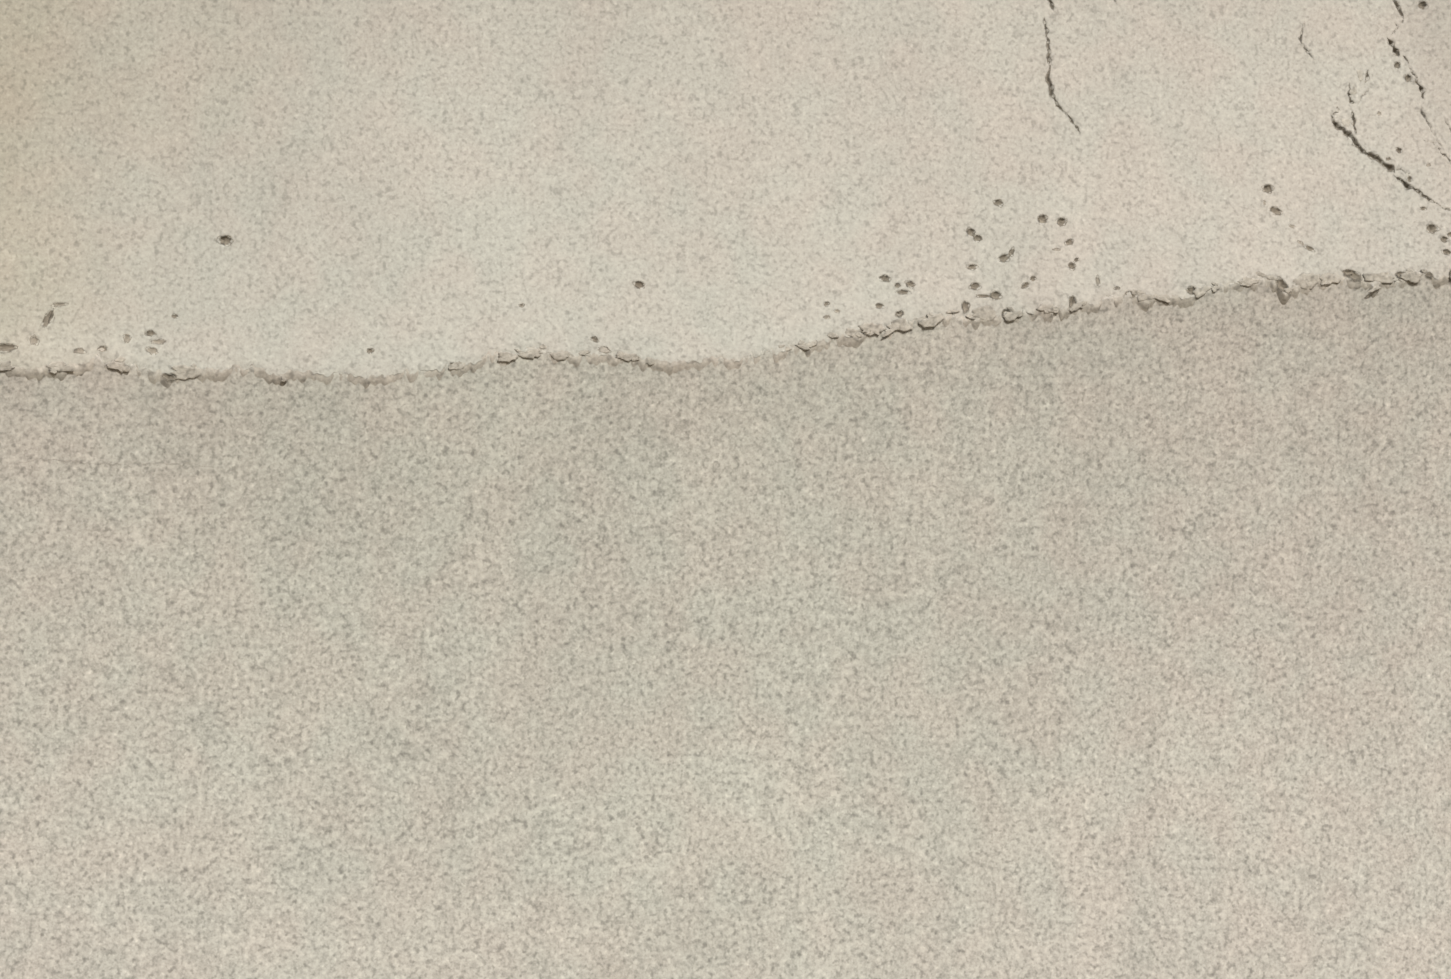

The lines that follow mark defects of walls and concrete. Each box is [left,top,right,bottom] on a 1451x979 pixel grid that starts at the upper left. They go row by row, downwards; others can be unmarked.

crack [1044,0,1080,132]
crack [1331,0,1451,211]
spalling [0,207,1451,389]